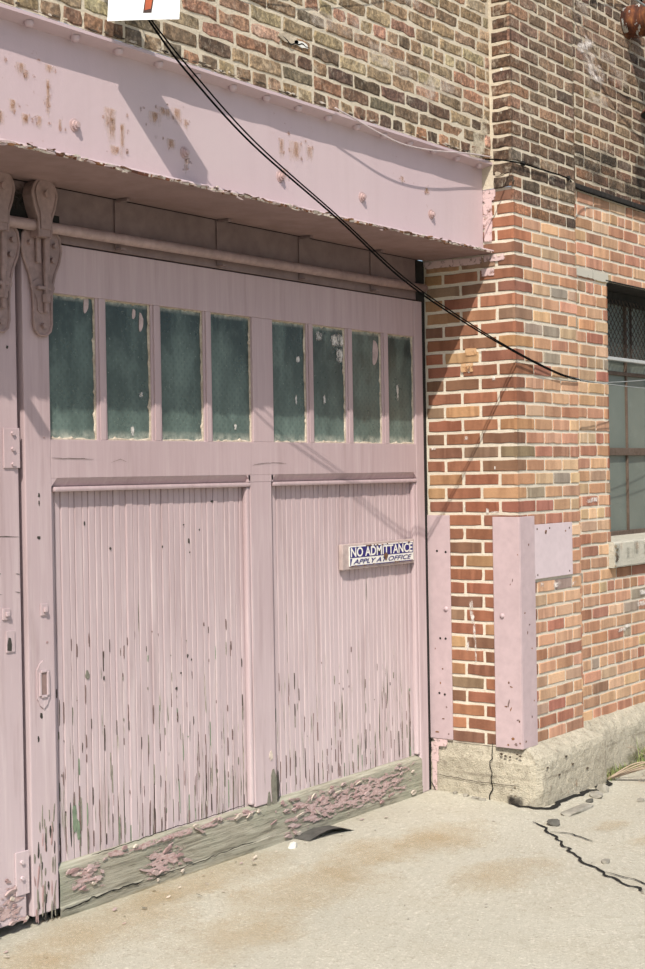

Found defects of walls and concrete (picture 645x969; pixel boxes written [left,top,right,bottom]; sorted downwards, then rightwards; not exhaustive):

spalling [182,57,265,84]
spalling [278,32,309,49]
peeling [0,140,132,173]
peeling [152,175,486,251]
peeling [85,631,135,704]
peeling [0,672,418,926]
crack [431,742,645,891]